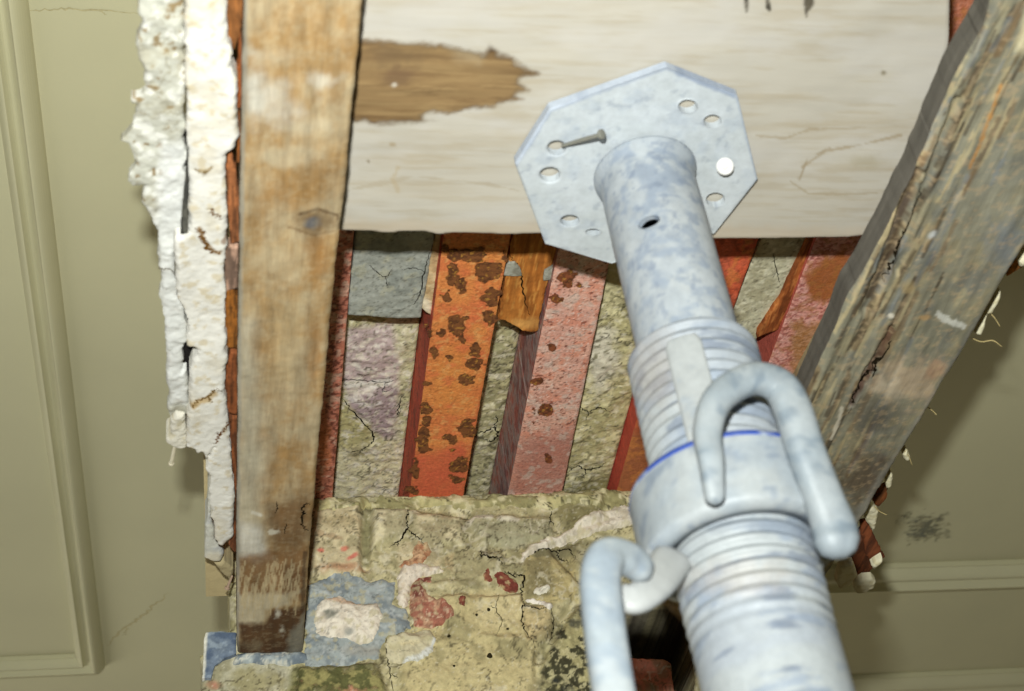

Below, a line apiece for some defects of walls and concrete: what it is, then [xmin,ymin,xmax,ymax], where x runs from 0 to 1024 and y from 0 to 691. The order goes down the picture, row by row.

spalling [121,0,239,546]
crack [369,245,433,304]
rust [440,244,508,326]
rust [548,269,582,304]
rust [423,315,487,386]
rust [403,402,477,495]
crack [393,510,423,547]
spalling [399,541,431,568]
spalling [409,576,466,629]
spalling [483,568,518,593]
crack [480,511,576,647]
water stain [902,512,942,541]